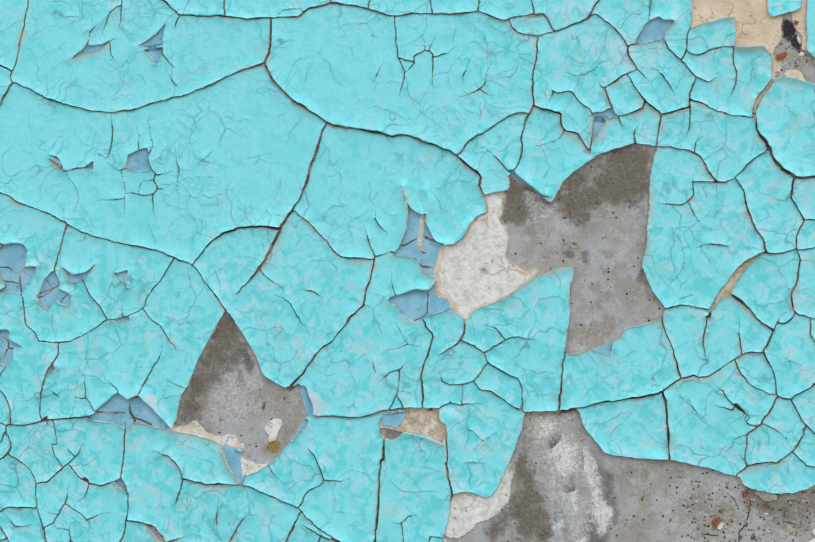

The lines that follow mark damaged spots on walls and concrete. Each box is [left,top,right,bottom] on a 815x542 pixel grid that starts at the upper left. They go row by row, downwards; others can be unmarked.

peeling [689,0,815,123]
peeling [0,244,36,295]
peeling [38,270,91,309]
crack [0,0,758,391]
peeling [389,143,666,353]
crack [421,123,815,475]
crack [0,370,348,542]
peeling [86,312,322,485]
crack [319,382,412,418]
crack [374,437,453,542]
peeling [444,410,815,542]
crack [728,488,751,542]